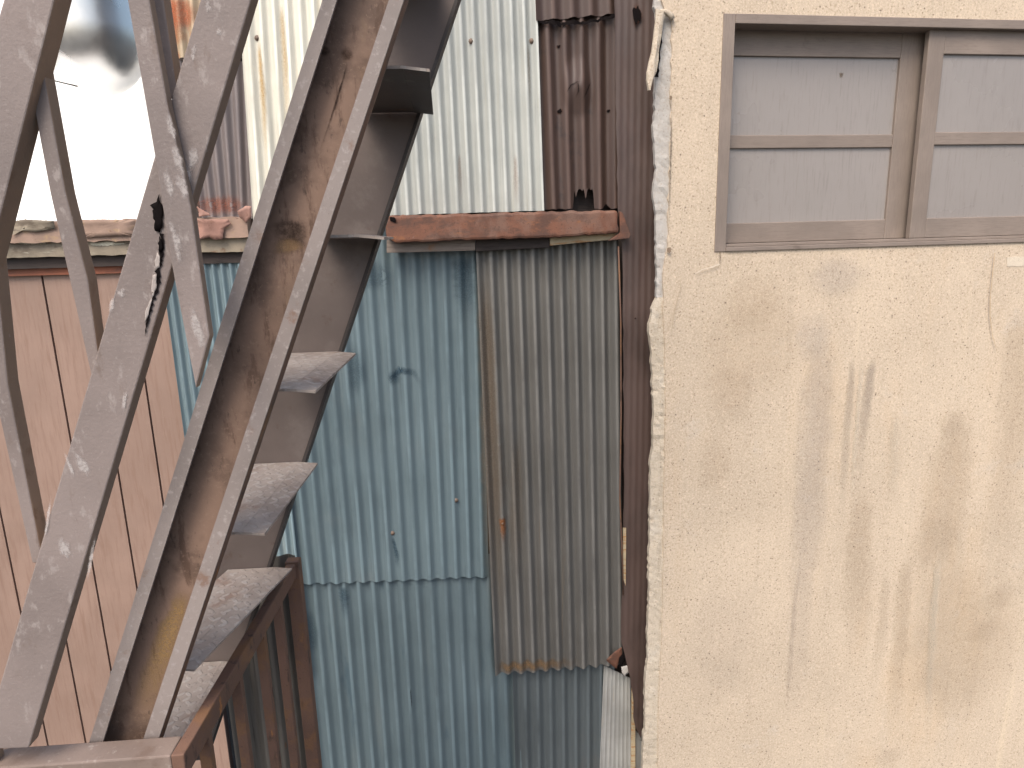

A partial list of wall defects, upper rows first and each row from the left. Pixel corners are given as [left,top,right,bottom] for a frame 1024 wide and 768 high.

rust [171,1,190,25]
crack [145,233,164,334]
spalling [641,0,675,768]